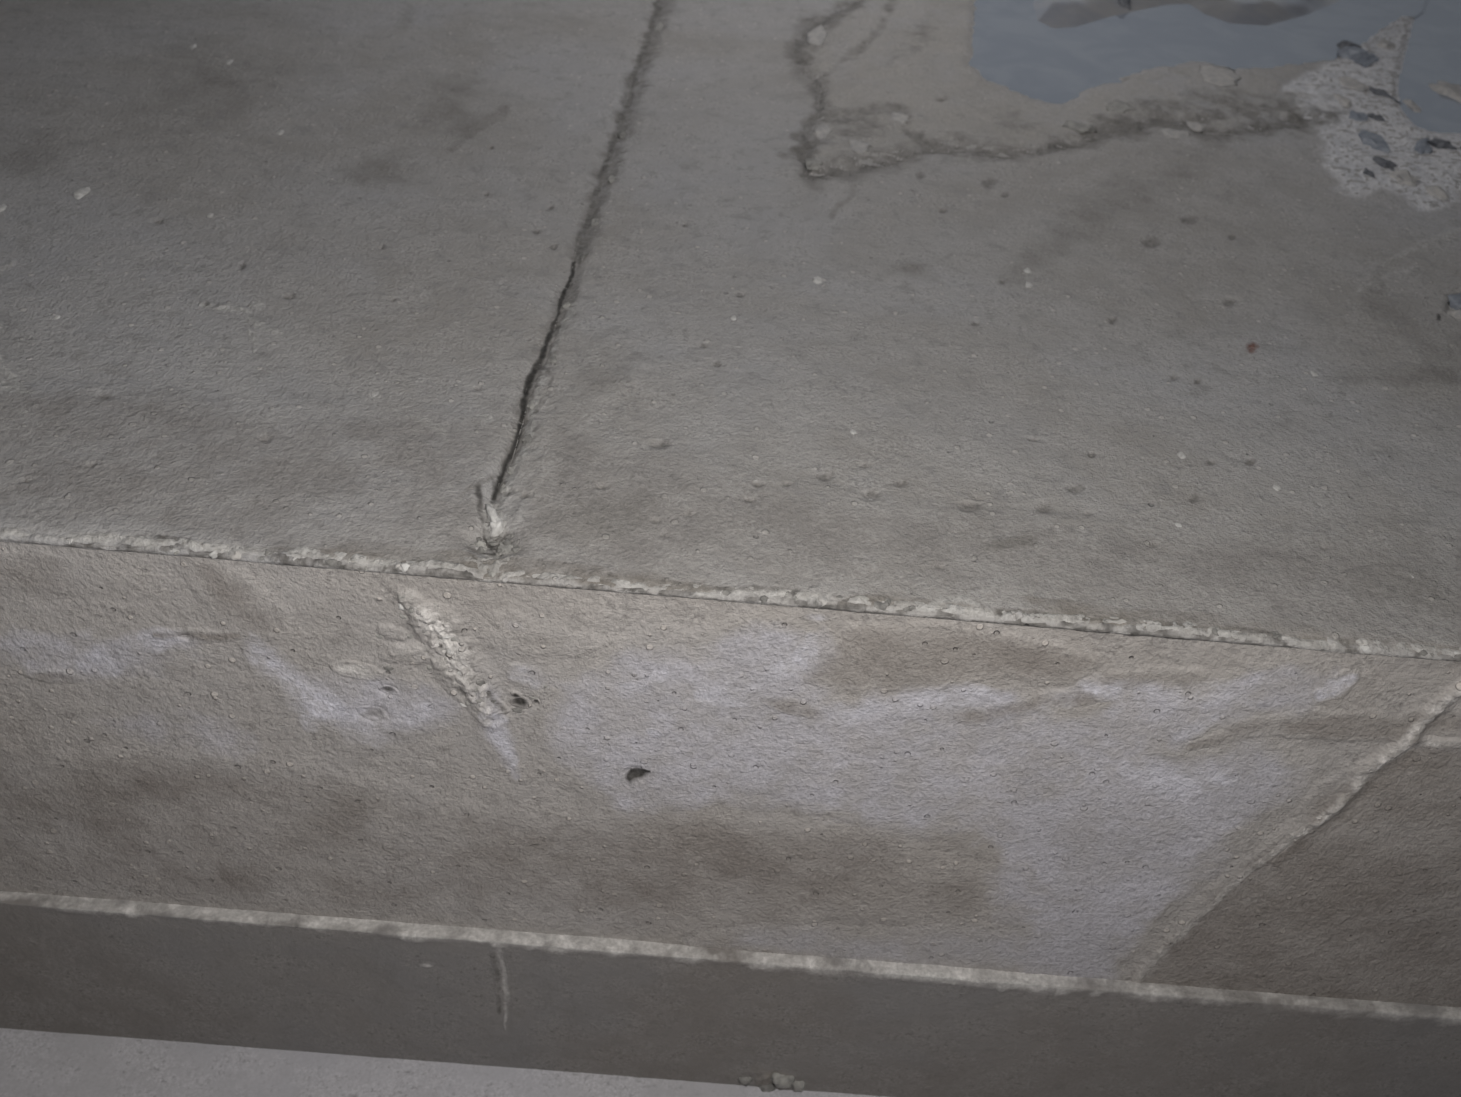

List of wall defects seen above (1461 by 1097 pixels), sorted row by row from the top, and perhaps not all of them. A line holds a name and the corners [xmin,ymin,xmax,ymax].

peeling [771,0,1461,216]
crack [496,0,682,526]
crack [0,527,1461,662]